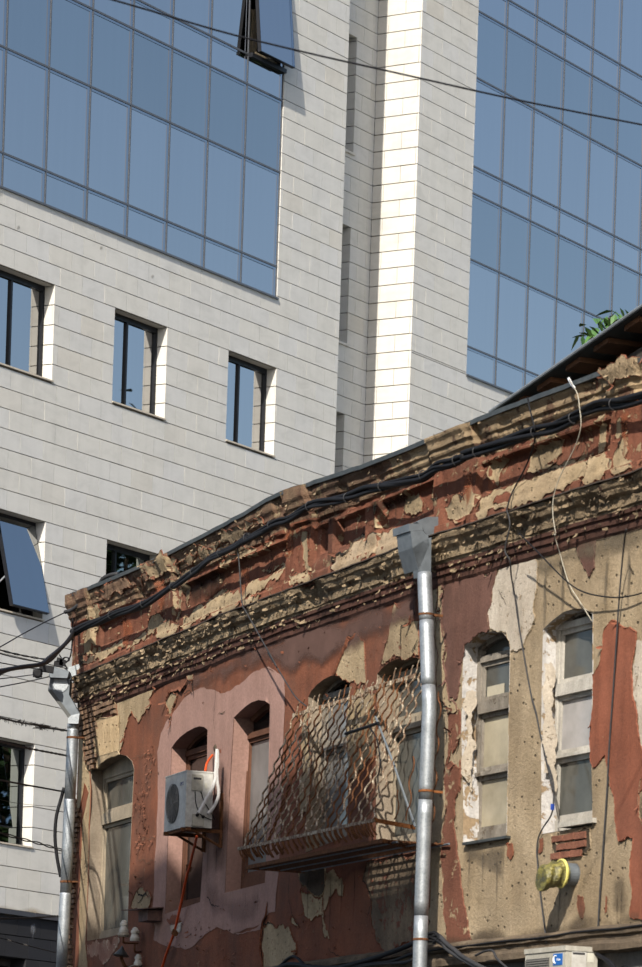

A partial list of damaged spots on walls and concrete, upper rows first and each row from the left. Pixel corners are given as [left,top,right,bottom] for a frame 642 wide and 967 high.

peeling [67,411,642,967]